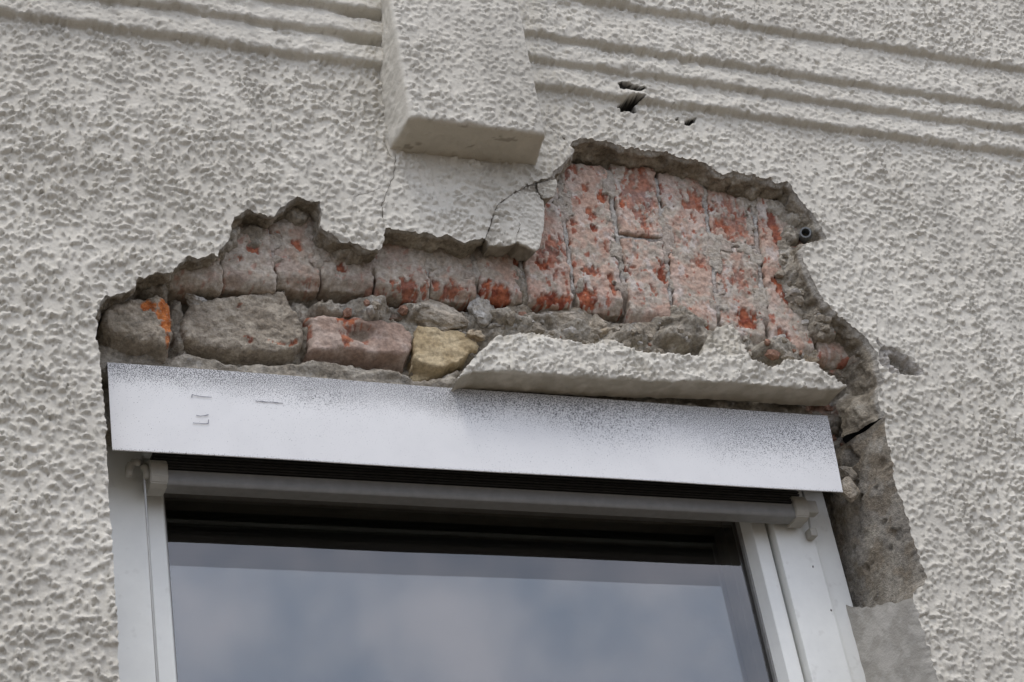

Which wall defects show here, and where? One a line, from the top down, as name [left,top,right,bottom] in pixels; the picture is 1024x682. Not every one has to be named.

spalling [95,138,927,608]